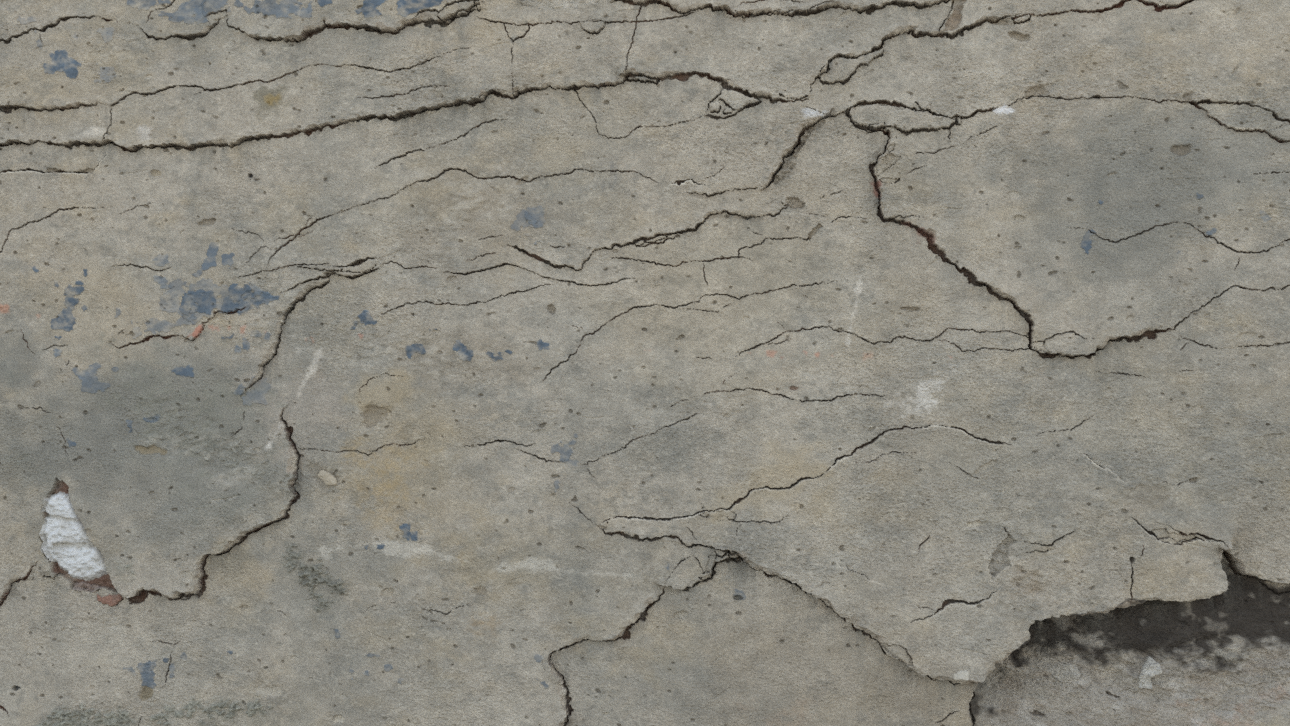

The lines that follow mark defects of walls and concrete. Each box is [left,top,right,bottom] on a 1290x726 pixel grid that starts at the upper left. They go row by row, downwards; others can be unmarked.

crack [0,0,1290,479]
crack [0,555,36,607]
flaking render [35,481,124,607]
crack [116,410,446,605]
crack [366,603,473,615]
crack [549,416,1105,726]
spalling [988,533,1018,579]
spalling [969,559,1290,726]
crack [1129,517,1290,604]